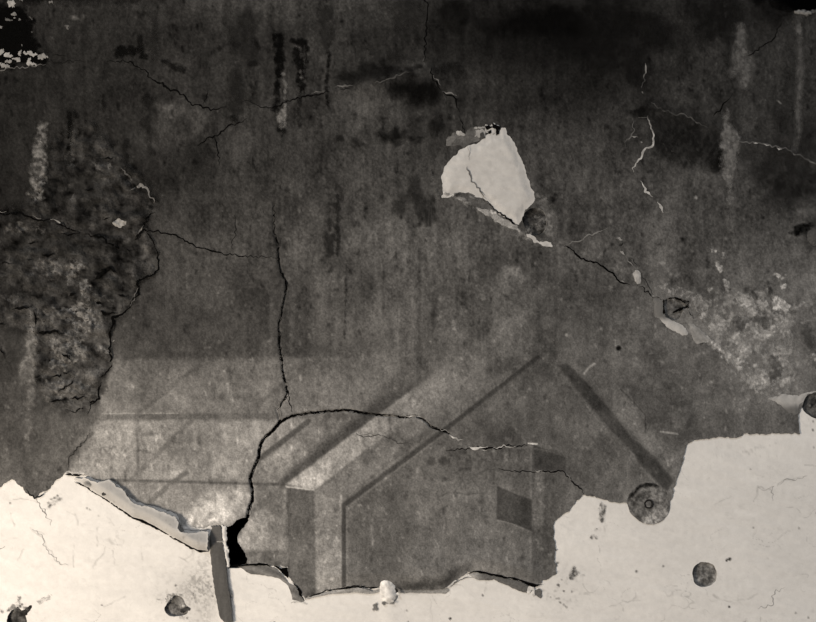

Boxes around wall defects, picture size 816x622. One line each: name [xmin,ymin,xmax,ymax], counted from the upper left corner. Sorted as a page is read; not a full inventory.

peeling [0,0,48,71]
leakage [27,122,48,201]
crack [107,59,353,164]
crack [423,0,517,225]
peeling [474,123,500,139]
crack [566,228,694,319]
leakage [19,311,37,448]
crack [0,206,584,518]
peeling [65,471,212,553]
spalling [232,563,542,611]